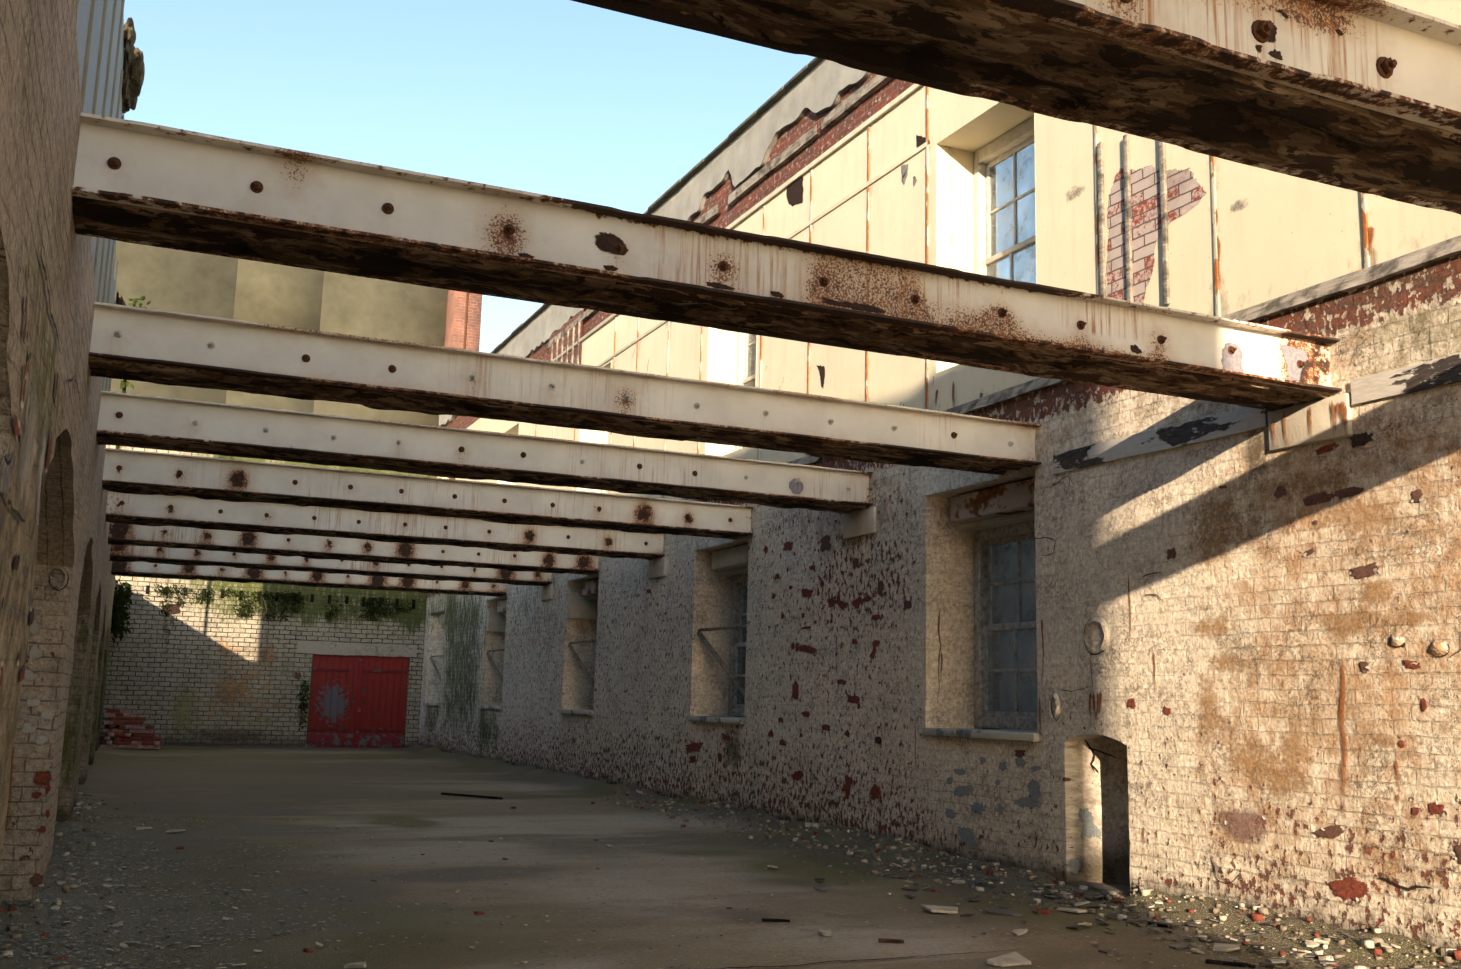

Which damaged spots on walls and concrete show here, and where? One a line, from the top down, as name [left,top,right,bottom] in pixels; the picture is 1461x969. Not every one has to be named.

rust [1256,10,1289,60]
rust [595,232,628,271]
flaking render [1106,165,1207,303]
rust [706,282,735,290]
rust [821,296,886,314]
leakage [1191,488,1238,565]
spalling [772,535,884,662]
leakage [1195,616,1228,635]
spalling [768,679,850,746]
leakage [1200,653,1244,735]
leakage [1232,731,1306,795]
peeling [946,748,1042,848]